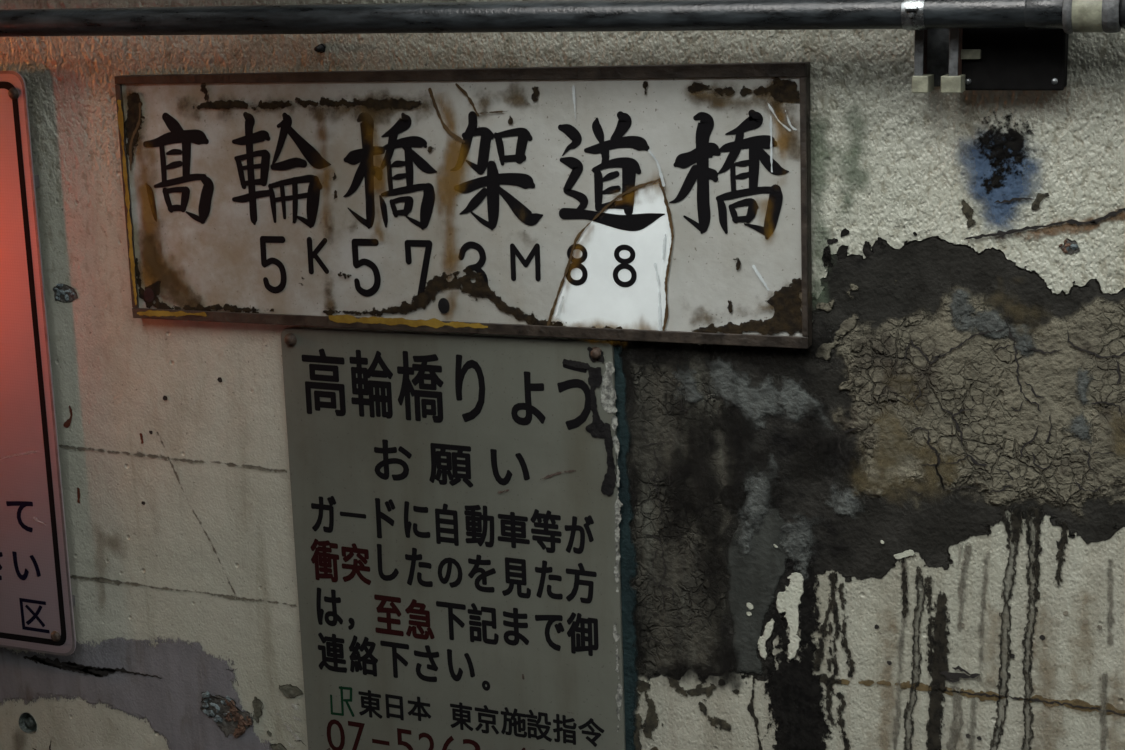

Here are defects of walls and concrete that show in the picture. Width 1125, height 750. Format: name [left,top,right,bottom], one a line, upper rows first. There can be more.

leakage [811,125,828,194]
leakage [845,143,864,203]
crack [964,197,1125,240]
leakage [612,344,663,750]
leakage [664,402,856,750]
leakage [725,341,821,368]
peeling [607,228,1125,684]
leakage [893,544,976,750]
leakage [977,553,989,681]
crack [890,309,1125,496]
leakage [989,505,1069,750]
leakage [1100,674,1108,750]